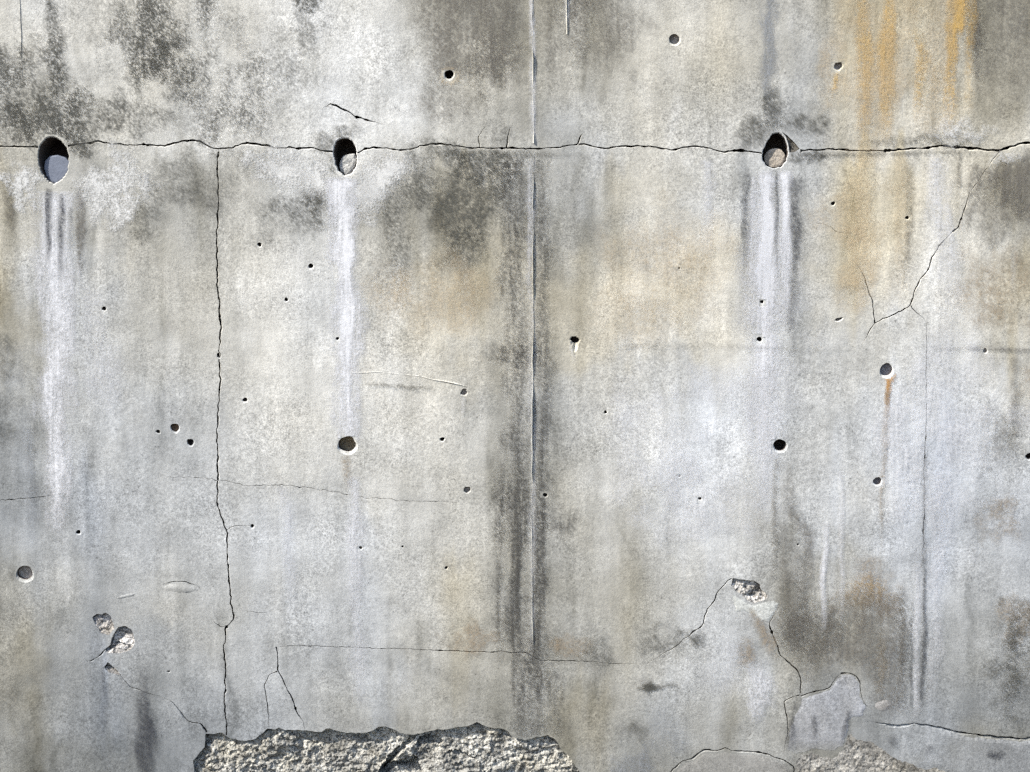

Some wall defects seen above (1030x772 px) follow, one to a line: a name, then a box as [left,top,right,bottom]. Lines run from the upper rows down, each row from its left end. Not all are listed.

water stain [110,0,217,99]
crack [325,103,762,155]
corrosion [946,0,965,94]
water stain [0,0,163,523]
water stain [742,142,877,481]
crack [800,141,1030,548]
crack [68,139,457,734]
water stain [495,319,548,717]
spalling [193,722,580,772]
crack [264,578,732,728]
crack [670,604,1030,772]
peeling [676,675,1030,772]